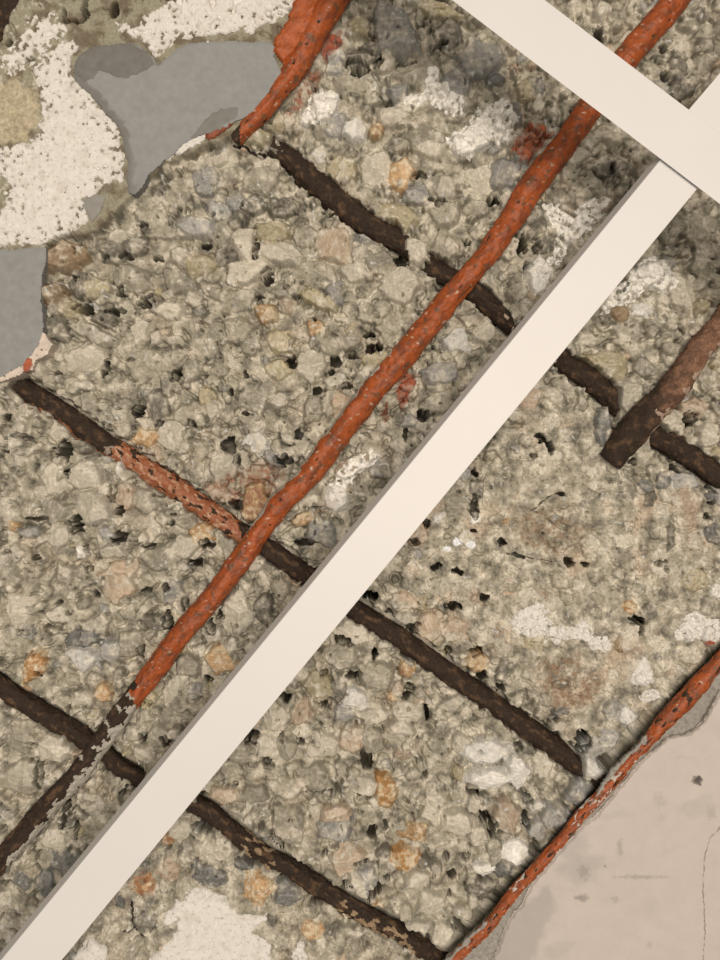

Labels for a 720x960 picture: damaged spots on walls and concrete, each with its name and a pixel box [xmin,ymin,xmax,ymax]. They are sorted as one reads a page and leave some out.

corrosion [322,34,342,60]
spalling [545,0,720,109]
corrosion [512,123,553,164]
spalling [0,0,581,543]
corrosion [380,373,416,421]
corrosion [215,463,284,515]
spalling [0,99,658,877]
spalling [0,760,137,953]